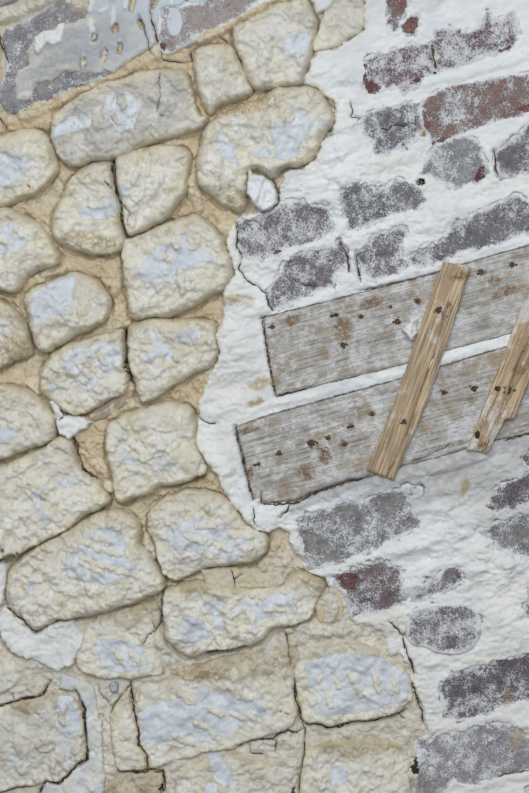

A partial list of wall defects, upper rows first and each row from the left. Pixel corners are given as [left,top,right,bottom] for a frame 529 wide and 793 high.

peeling [34,23,66,56]
spalling [402,22,418,33]
spalling [363,63,382,94]
peeling [216,116,278,212]
spalling [474,166,489,182]
corrosion [334,319,351,341]
spalling [338,572,358,589]
crack [7,607,36,632]
crack [0,681,51,707]
crack [237,622,424,793]
crack [0,692,89,793]
crack [98,682,166,793]